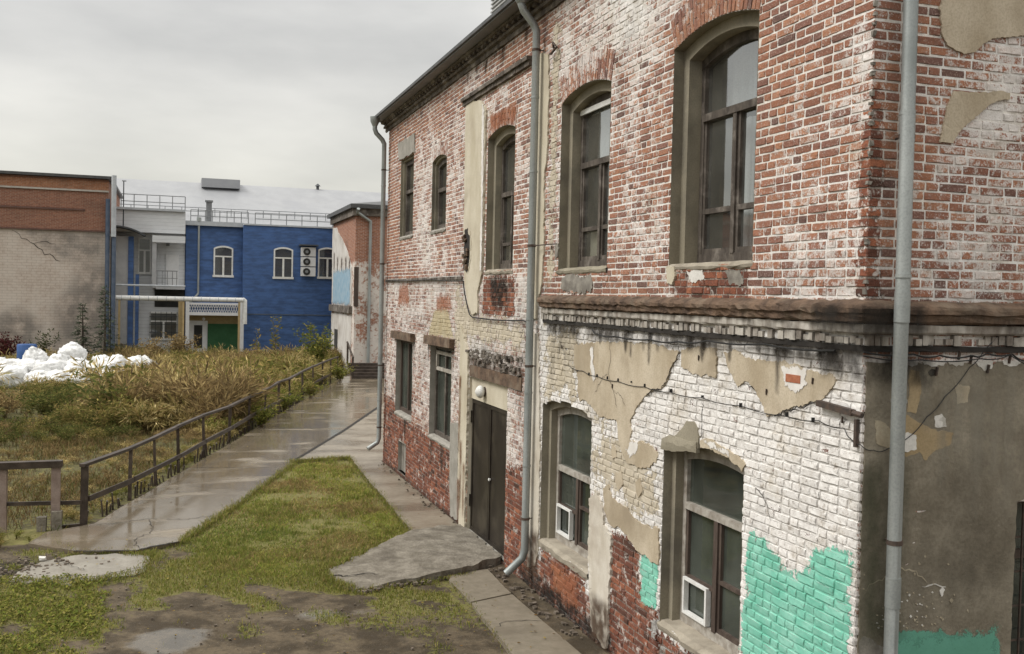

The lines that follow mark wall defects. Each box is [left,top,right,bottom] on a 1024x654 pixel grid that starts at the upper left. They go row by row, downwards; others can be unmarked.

flaking render [938,0,1024,54]
flaking render [939,90,1010,144]
flaking render [383,20,837,654]
leakage [642,332,715,356]
leakage [774,344,859,376]
leakage [813,306,894,334]
leakage [878,351,893,378]
leakage [907,355,928,381]
flaking render [905,360,1020,461]
crack [54,516,207,581]
peeling [738,531,884,654]